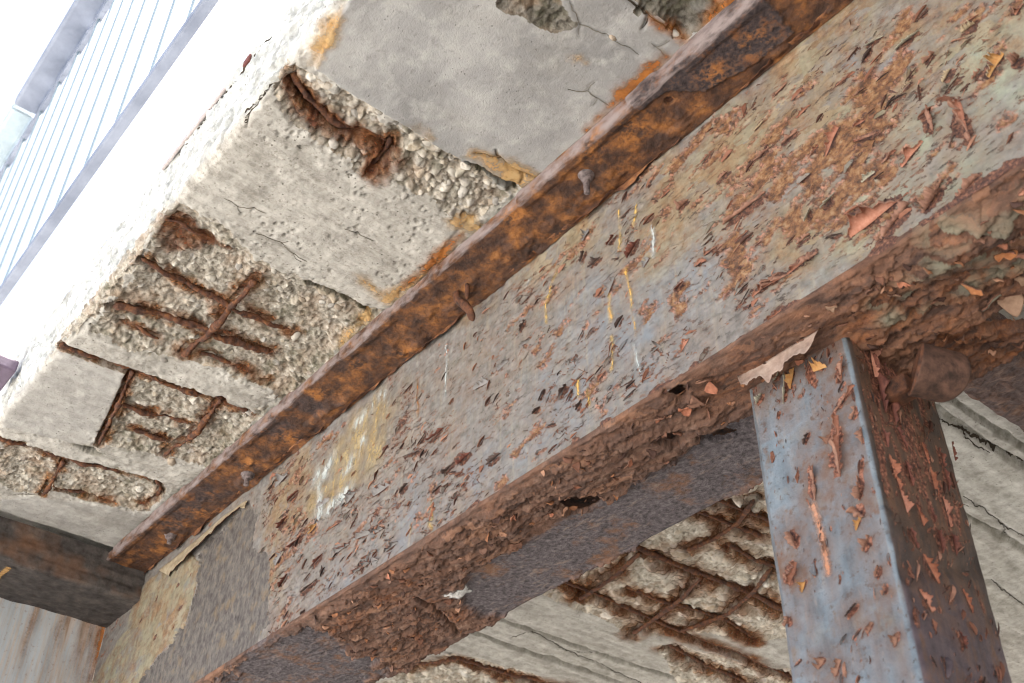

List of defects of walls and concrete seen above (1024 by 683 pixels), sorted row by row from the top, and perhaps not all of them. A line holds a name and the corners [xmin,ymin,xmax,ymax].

crack [569,0,684,55]
rust [285,66,402,185]
rust [157,212,230,252]
crack [224,198,305,262]
rust [361,211,481,304]
rust [145,254,278,360]
spalling [52,201,385,467]
peeling [213,0,1024,683]
spalling [0,436,166,512]
rust [97,369,255,456]
crack [941,419,1023,461]
crack [963,496,1024,536]